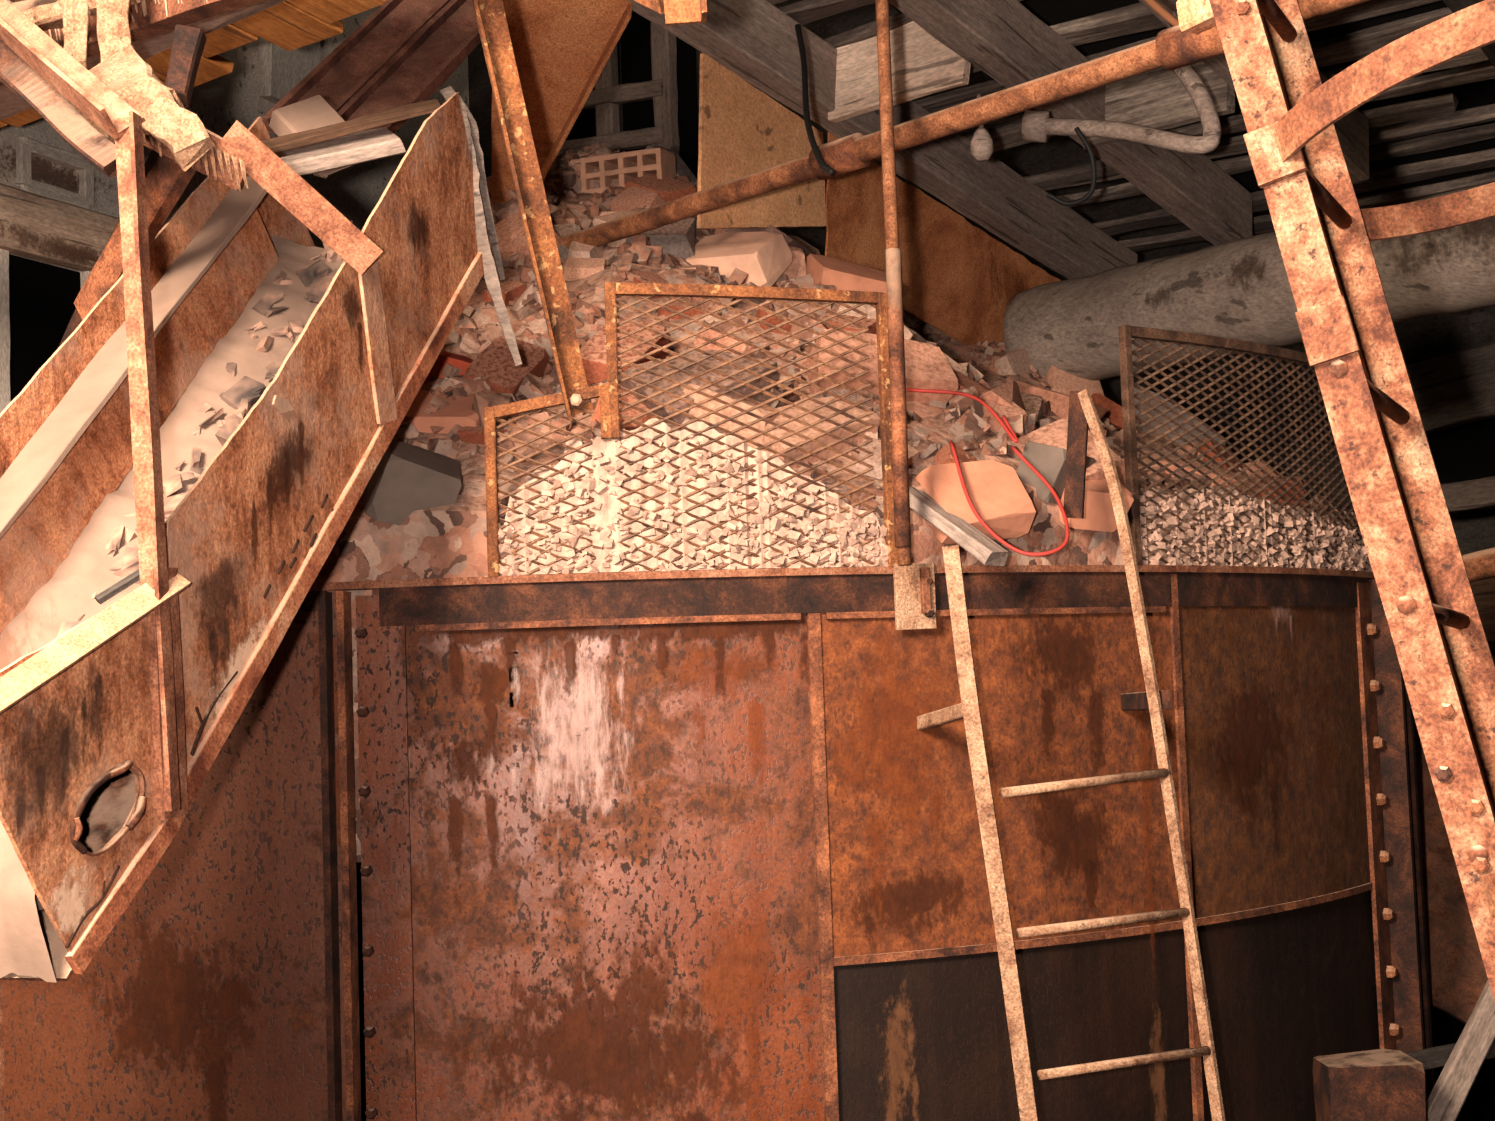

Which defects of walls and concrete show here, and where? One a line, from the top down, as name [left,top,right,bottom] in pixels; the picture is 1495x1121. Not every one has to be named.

rust [408,203,428,266]
rust [343,284,363,369]
rust [251,422,312,561]
rust [201,560,237,686]
rust [8,676,102,832]
rust [437,620,808,872]
rust [1023,617,1103,770]
rust [851,867,963,941]
rust [1035,792,1112,908]
rust [491,940,743,1121]